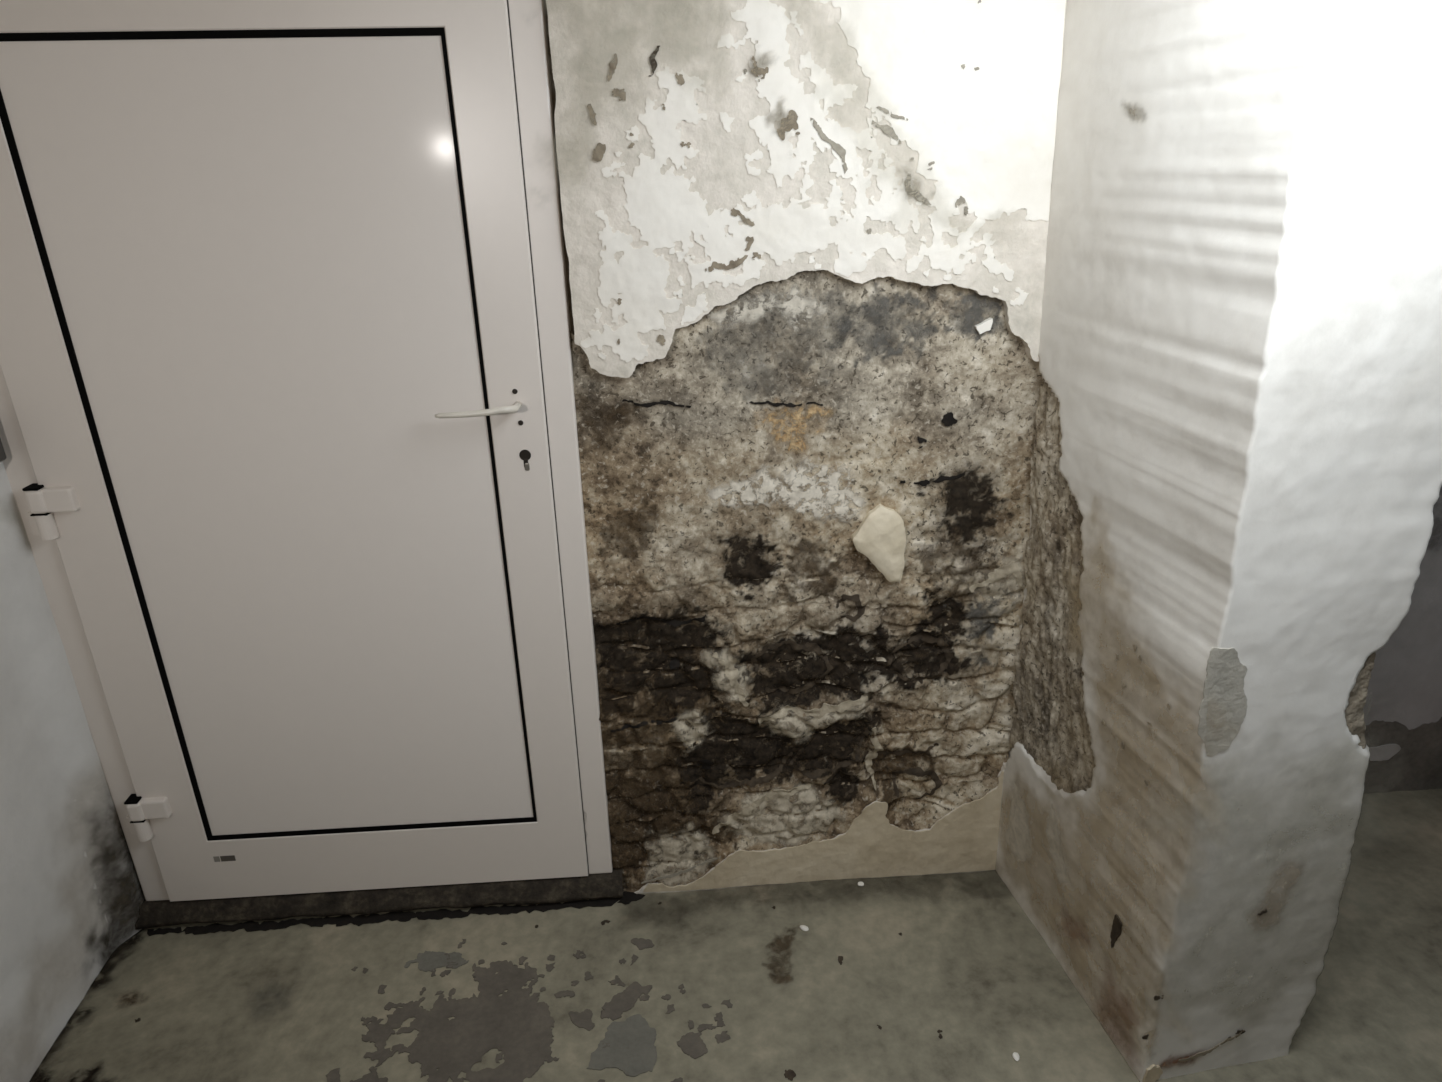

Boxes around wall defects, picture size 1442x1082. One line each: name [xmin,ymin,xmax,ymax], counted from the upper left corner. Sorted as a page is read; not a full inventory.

leakage [711,288,825,329]
leakage [830,283,1003,367]
flaking render [570,0,1106,904]
peeling [1197,647,1247,756]
peeling [1345,652,1442,794]
leakage [1004,631,1205,986]
leakage [86,817,145,993]
leakage [29,1008,91,1082]
leakage [70,1066,110,1082]